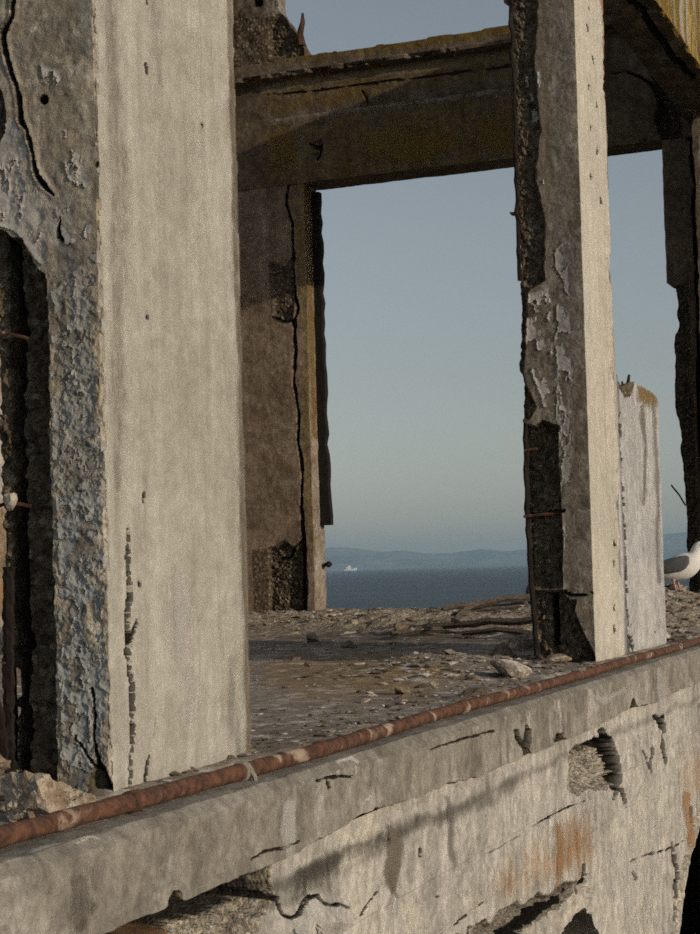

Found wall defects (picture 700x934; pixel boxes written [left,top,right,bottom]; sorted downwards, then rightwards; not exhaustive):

peeling [41,63,62,86]
crack [626,0,697,80]
crack [0,0,65,243]
spalling [504,0,596,663]
crack [271,185,308,611]
spalling [0,89,113,791]
crack [74,528,151,788]
spalling [554,731,614,797]
crack [250,839,301,862]
spalling [105,865,275,934]
crack [201,885,378,921]
spalling [454,877,594,934]